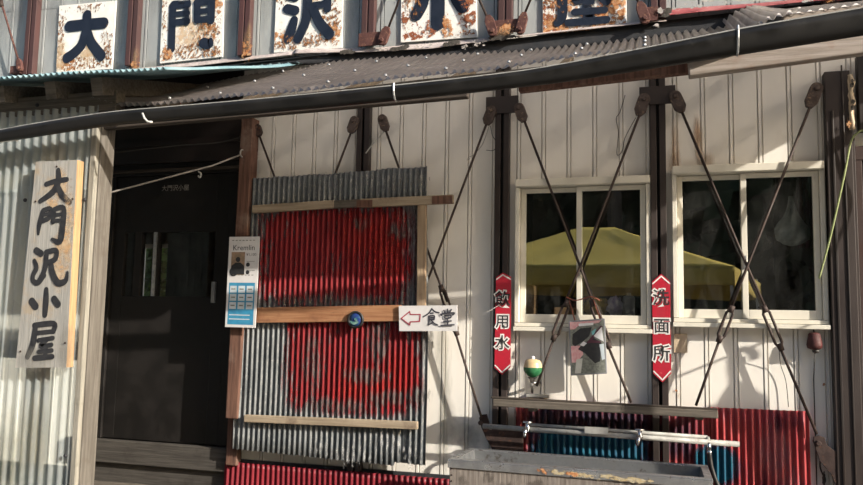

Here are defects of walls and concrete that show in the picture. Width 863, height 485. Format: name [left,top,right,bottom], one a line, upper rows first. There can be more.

rust [56,3,113,71]
rust [160,0,223,61]
rust [274,0,342,51]
rust [401,0,476,40]
rust [543,0,626,34]
peeling [280,293,379,307]
peeling [306,322,430,413]